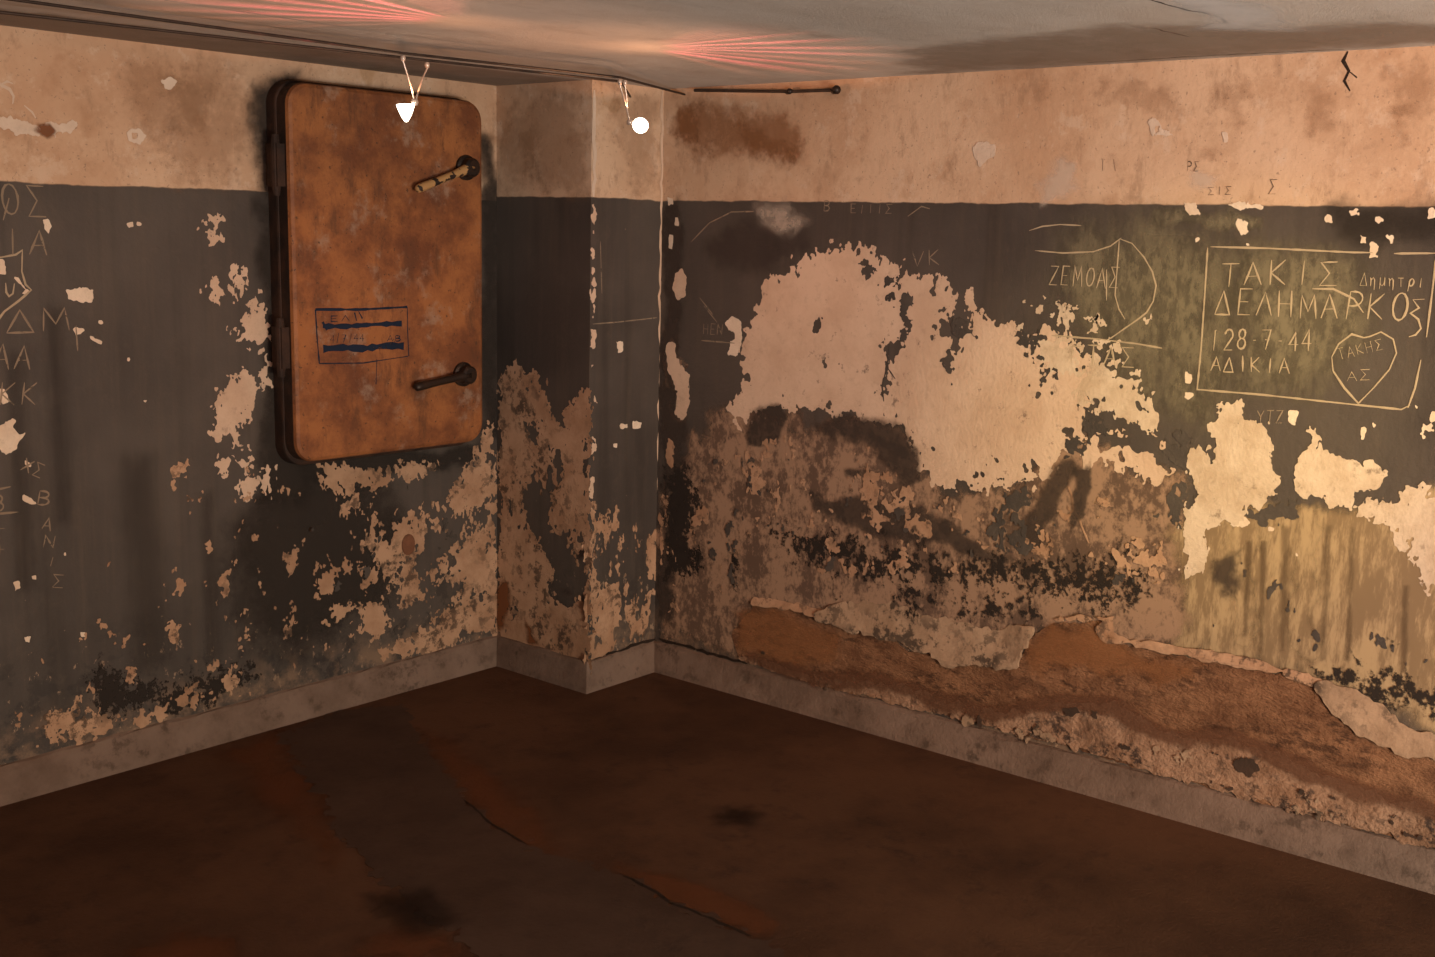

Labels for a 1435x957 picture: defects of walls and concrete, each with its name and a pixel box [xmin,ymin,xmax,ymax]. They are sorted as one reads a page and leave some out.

crack [1088,0,1357,91]
water stain [676,104,797,161]
peeling [197,213,226,247]
peeling [66,287,93,303]
peeling [73,320,103,344]
peeling [200,263,301,503]
peeling [170,458,204,515]
water stain [820,416,920,486]
peeling [257,239,1435,848]
water stain [769,460,1435,732]
peeling [15,559,252,747]
water stain [741,612,1435,821]